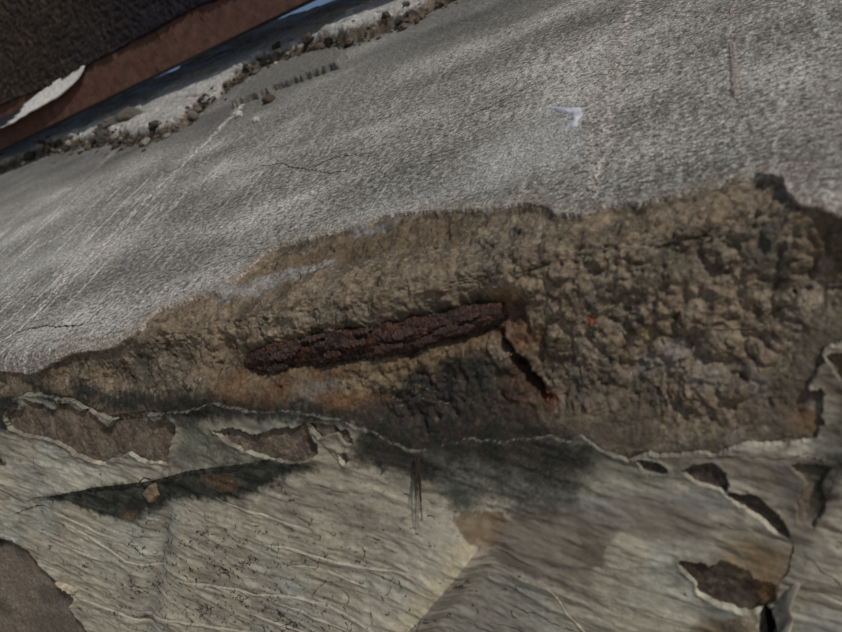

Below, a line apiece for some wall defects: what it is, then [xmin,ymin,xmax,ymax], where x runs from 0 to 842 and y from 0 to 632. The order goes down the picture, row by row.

spalling [0,179,842,472]
peeling [143,481,160,503]
peeling [685,463,789,534]
peeling [793,463,826,523]